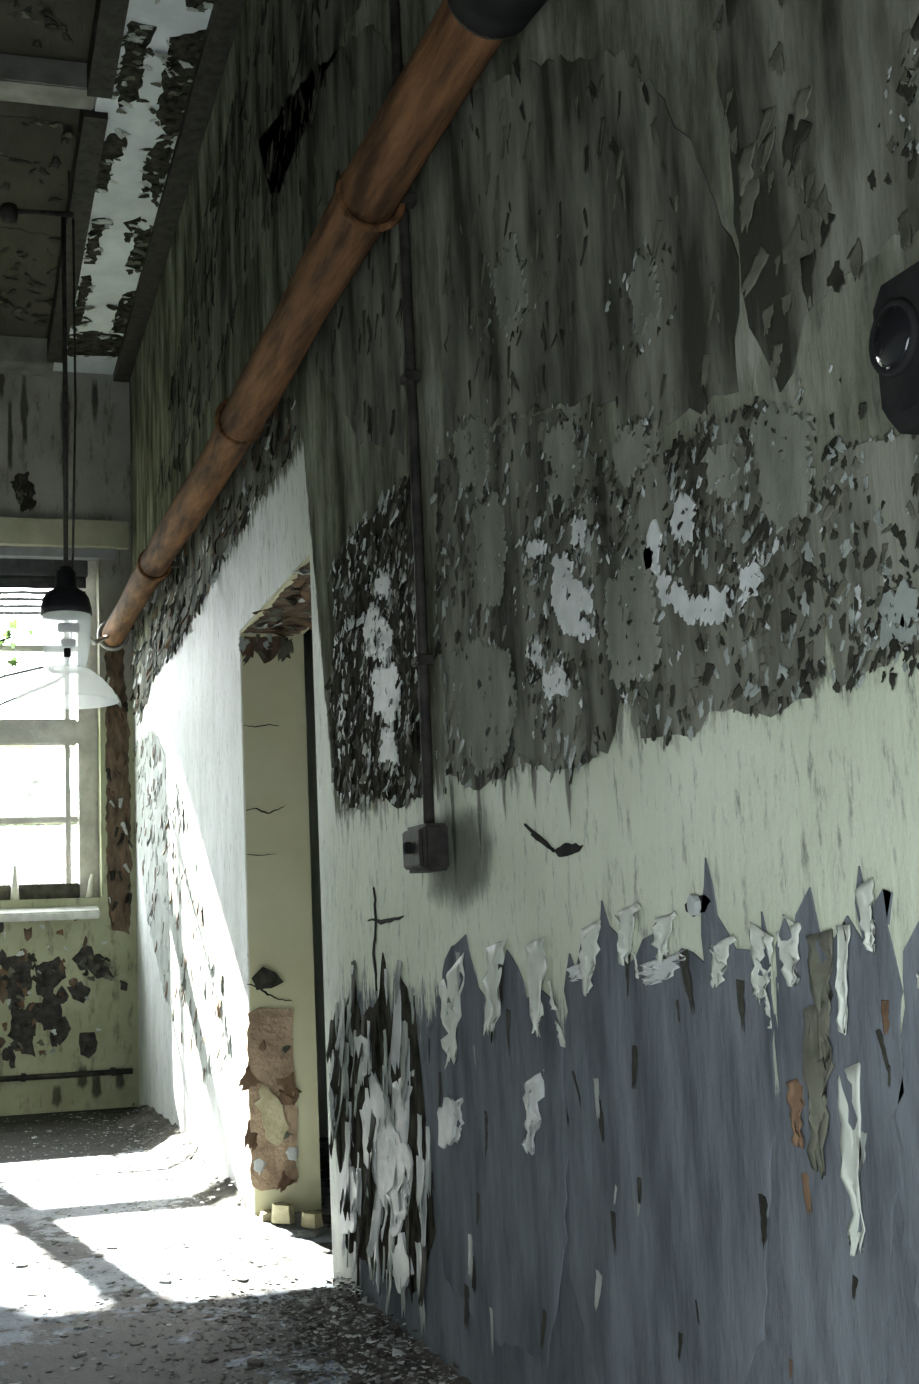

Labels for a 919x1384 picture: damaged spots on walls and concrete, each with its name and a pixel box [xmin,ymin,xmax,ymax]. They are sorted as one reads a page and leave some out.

peeling [67,21,206,360]
peeling [0,397,302,1193]
flaking render [524,823,583,857]
peeling [326,858,919,1384]